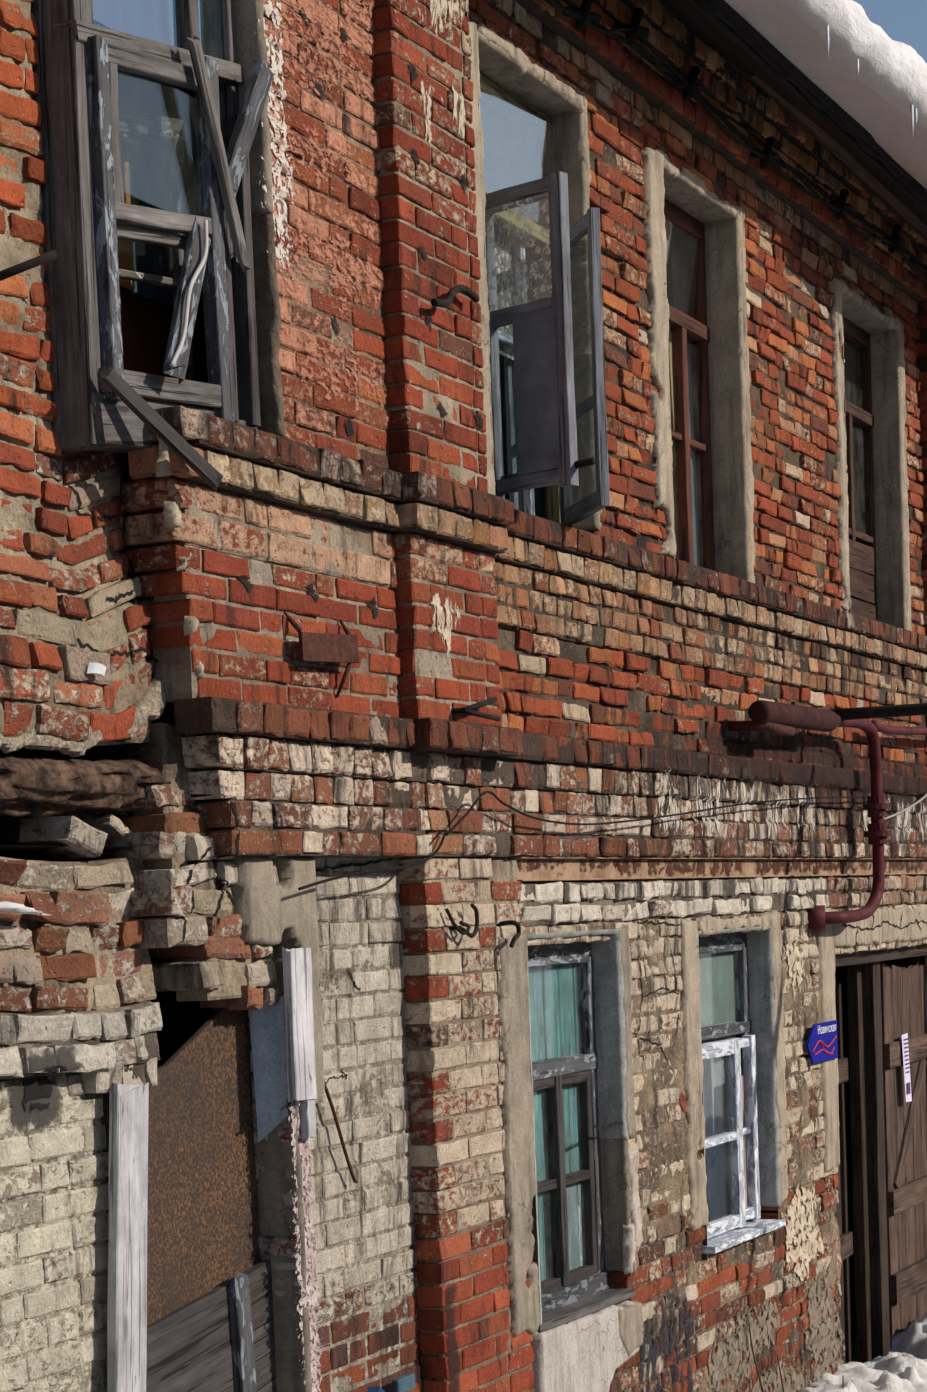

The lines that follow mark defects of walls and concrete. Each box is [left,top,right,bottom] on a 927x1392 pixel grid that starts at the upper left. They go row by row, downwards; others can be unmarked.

spalling [408,62,419,80]
peeling [254,0,387,438]
spalling [86,662,106,677]
spalling [47,741,153,761]
spalling [0,812,132,859]
crack [841,915,927,950]
peeling [281,1101,322,1392]
spalling [531,1300,643,1392]